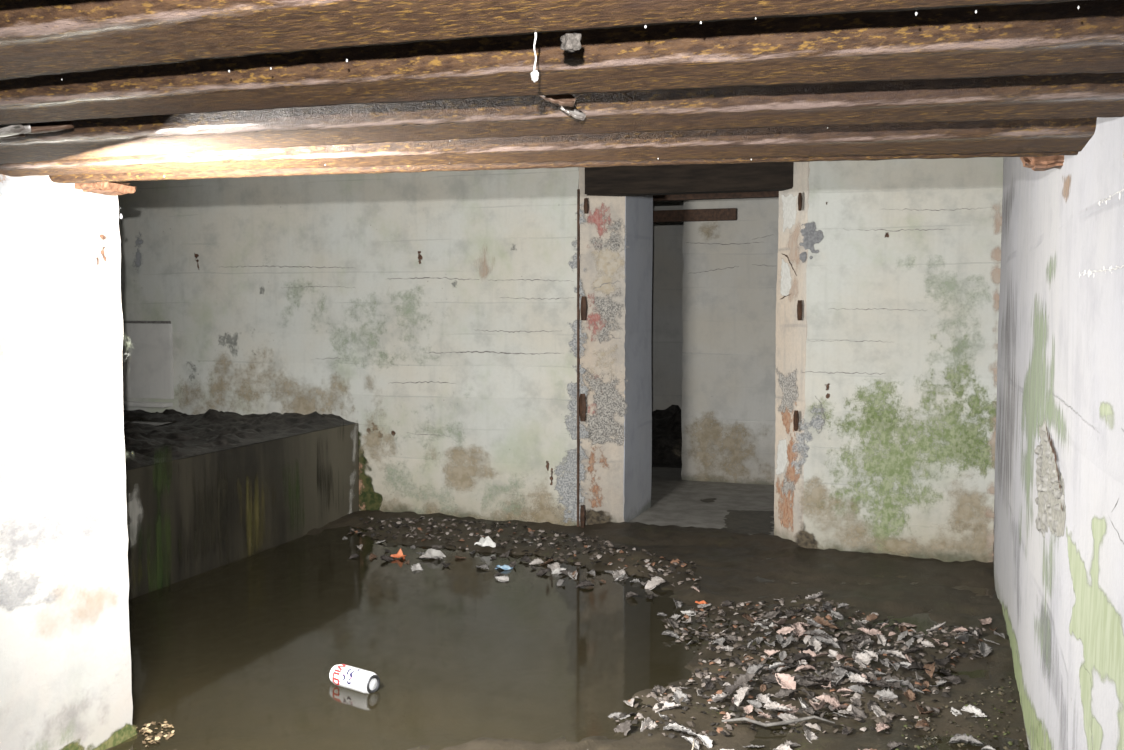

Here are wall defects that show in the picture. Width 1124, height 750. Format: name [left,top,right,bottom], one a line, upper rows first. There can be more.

peeling [780,194,824,296]
water stain [183,333,258,409]
water stain [276,377,346,415]
water stain [349,425,391,514]
water stain [444,449,493,489]
water stain [495,494,570,526]
spalling [554,216,628,523]
spalling [776,369,826,496]
water stain [843,493,989,554]
spalling [1034,419,1066,538]
water stain [0,573,54,609]
water stain [1080,665,1103,750]